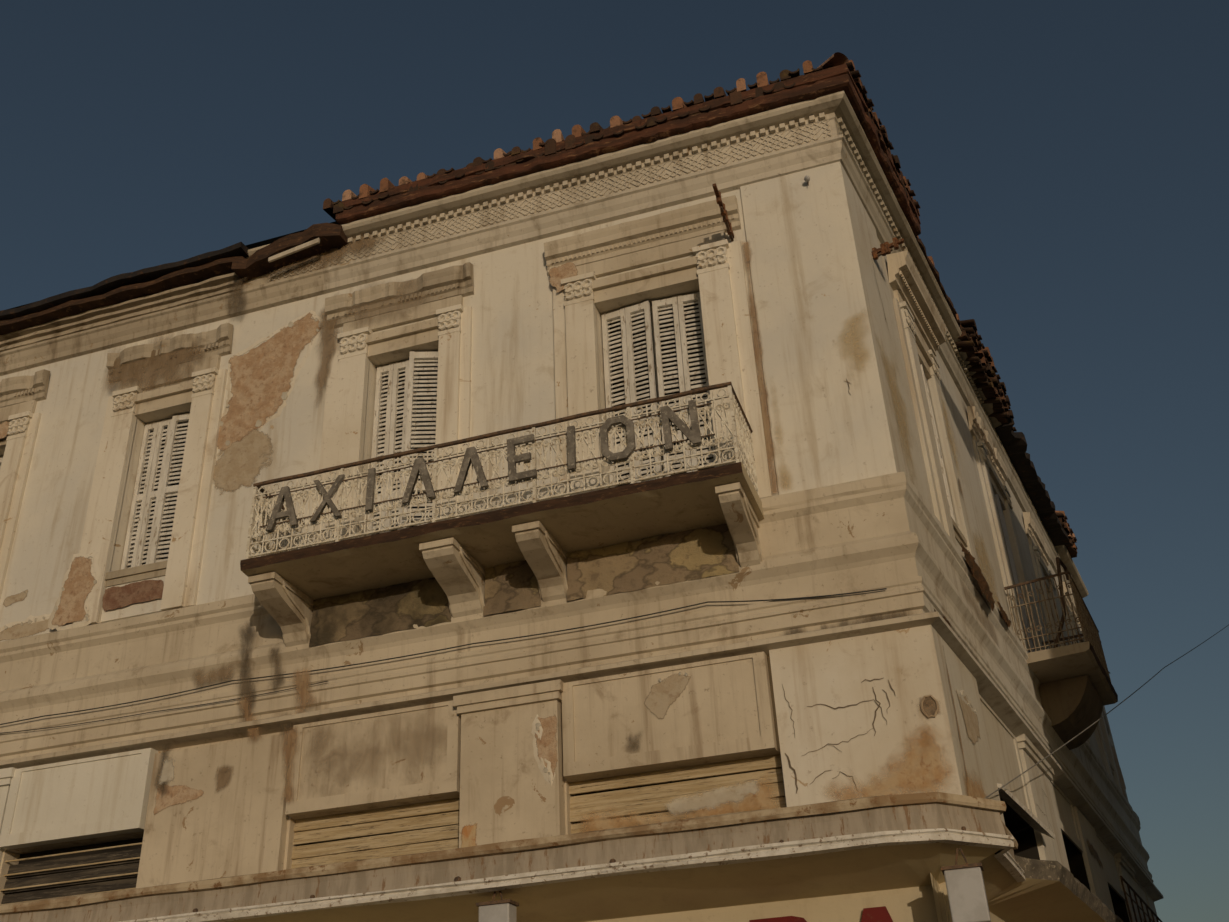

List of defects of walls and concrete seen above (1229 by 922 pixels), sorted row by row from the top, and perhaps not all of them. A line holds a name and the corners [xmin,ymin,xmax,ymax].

flaking render [213,310,323,495]
flaking render [0,552,164,641]
flaking render [531,714,558,786]
flaking render [644,672,690,719]
crack [782,678,895,794]
flaking render [956,688,980,744]